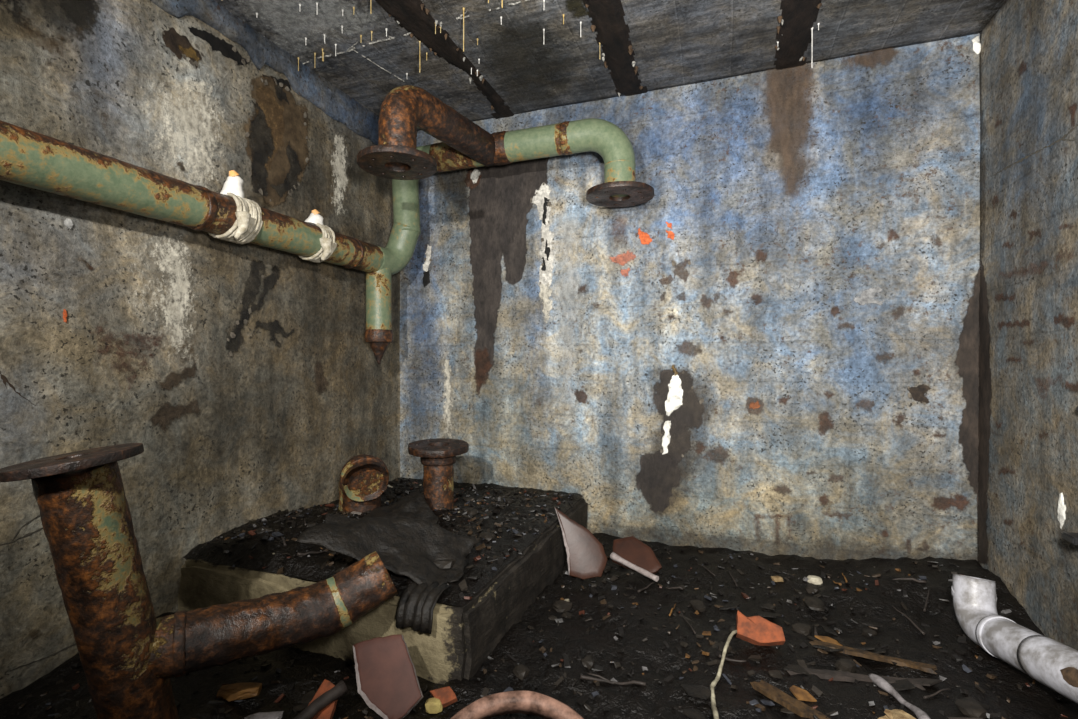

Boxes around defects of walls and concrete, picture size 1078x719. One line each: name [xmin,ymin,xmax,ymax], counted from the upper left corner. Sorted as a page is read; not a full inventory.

water stain [0,0,102,48]
spalling [162,27,250,69]
water stain [970,0,1004,54]
water stain [467,157,549,394]
corrosion [610,228,652,277]
spalling [678,341,702,355]
spalling [662,365,683,454]